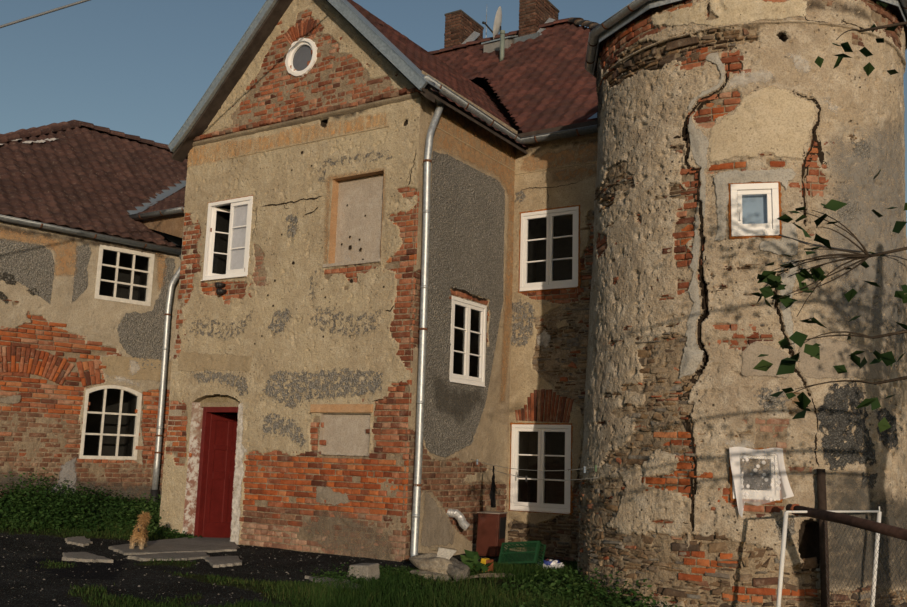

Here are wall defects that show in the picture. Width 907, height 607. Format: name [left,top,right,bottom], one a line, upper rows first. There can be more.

flaking render [173,213,276,359]
crack [253,196,321,232]
flaking render [219,9,399,131]
flaking render [599,0,758,88]
crack [674,62,741,383]
flaking render [687,90,740,128]
crack [792,91,828,226]
flaking render [0,311,192,503]
flaking render [235,187,508,562]
crack [683,415,697,536]
flaking render [508,161,907,607]
crack [773,274,819,466]